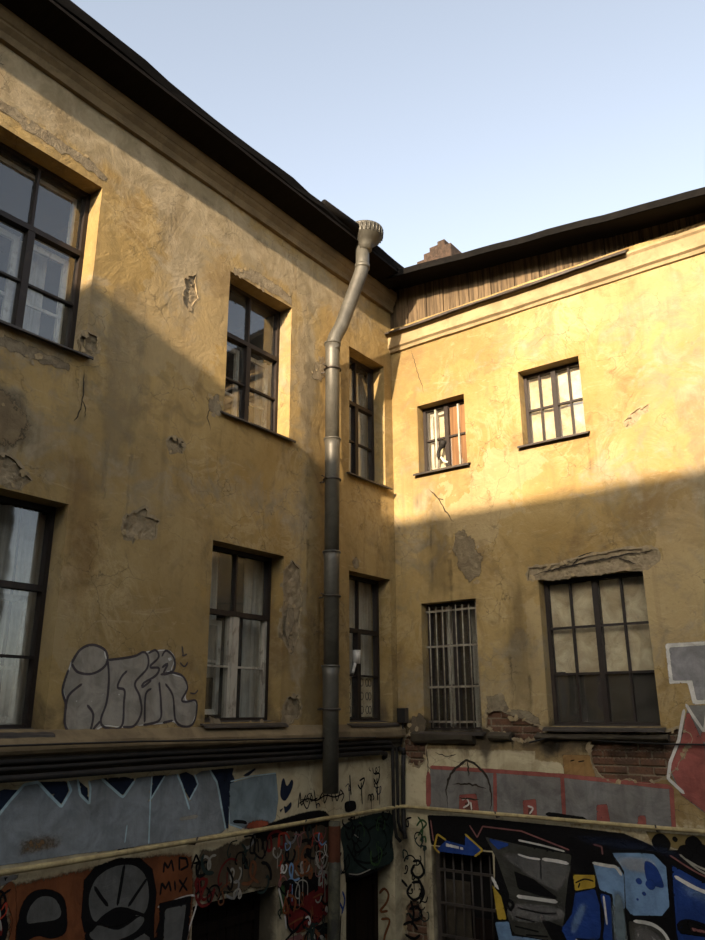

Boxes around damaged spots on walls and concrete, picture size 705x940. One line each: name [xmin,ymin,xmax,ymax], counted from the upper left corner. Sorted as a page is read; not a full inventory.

flaking render [0,330,70,371]
crack [75,377,86,420]
flaking render [0,451,33,491]
flaking render [121,505,161,544]
flaking render [525,545,661,582]
flaking render [483,693,547,743]
flaking render [586,726,693,785]
flaking render [403,899,429,940]